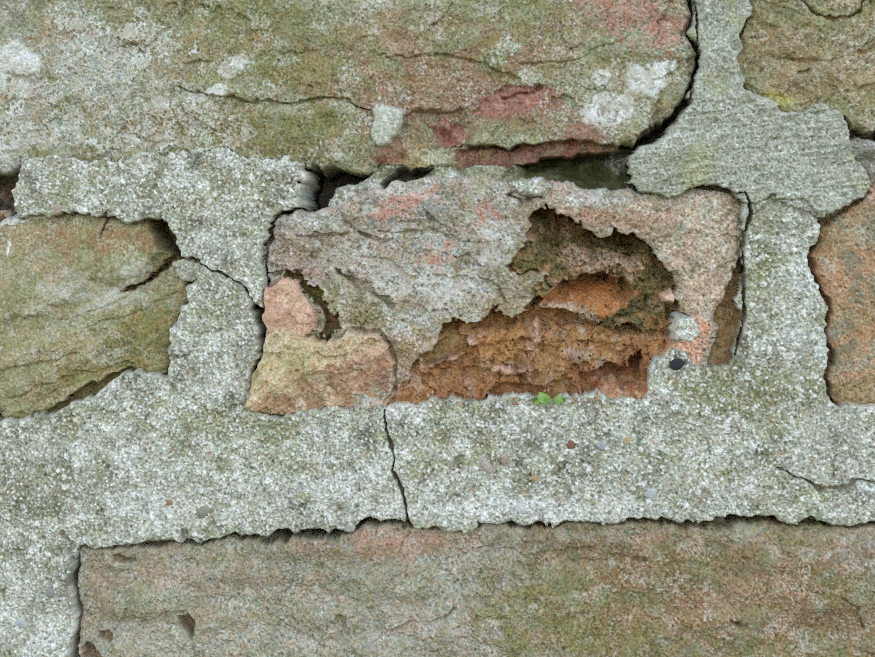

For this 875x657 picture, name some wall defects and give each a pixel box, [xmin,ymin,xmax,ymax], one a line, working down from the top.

peeling [365,179,456,221]
peeling [512,177,553,198]
spalling [386,206,701,408]
crack [384,409,410,520]
crack [776,467,875,493]